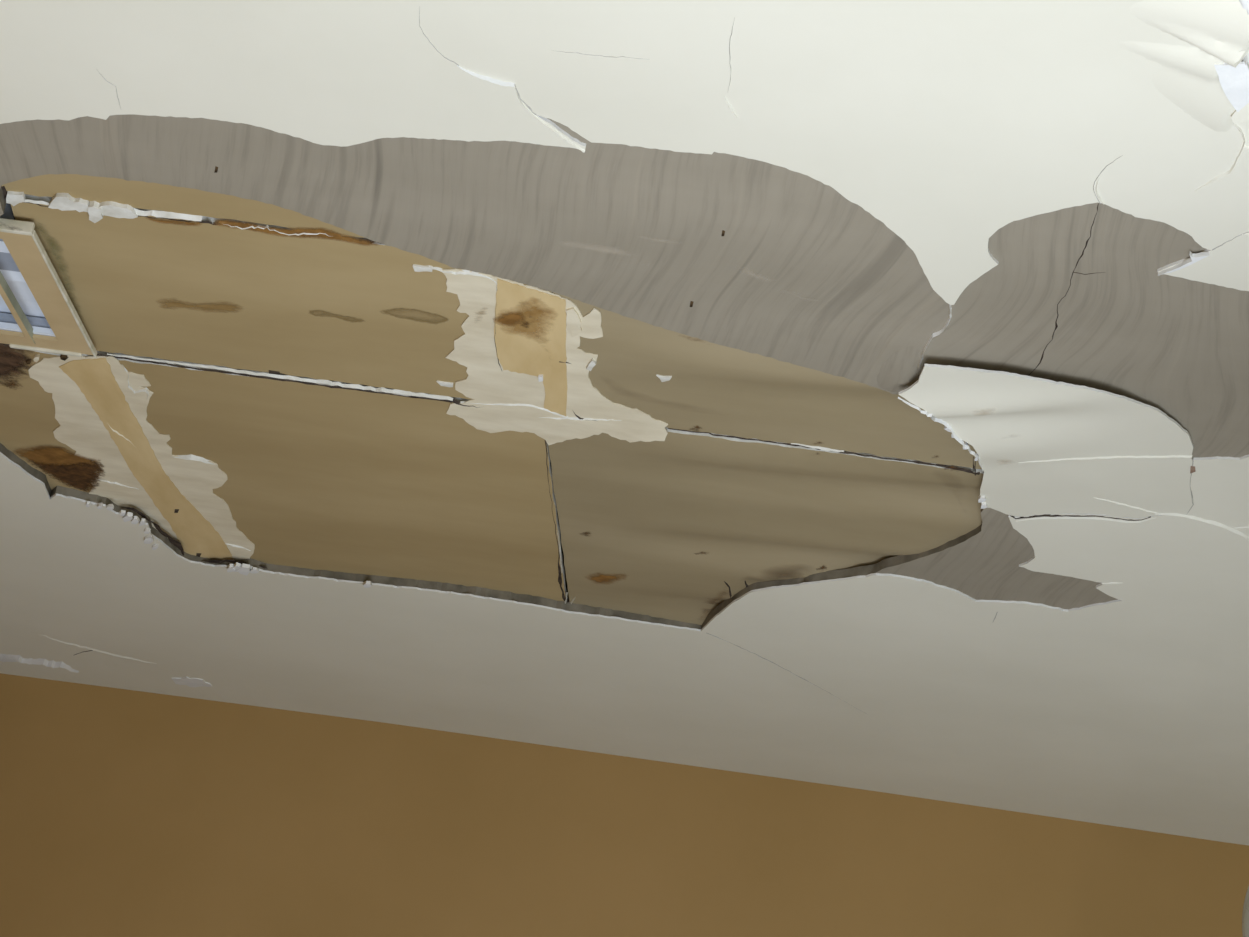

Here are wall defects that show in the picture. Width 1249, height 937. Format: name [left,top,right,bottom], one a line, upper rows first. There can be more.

crack [419,9,585,153]
peeling [1195,53,1249,191]
damp [0,343,31,385]
damp [162,302,238,312]
damp [310,311,363,322]
peeling [0,114,1249,458]
crack [1028,155,1123,376]
peeling [0,443,1118,630]
crack [1010,455,1249,540]